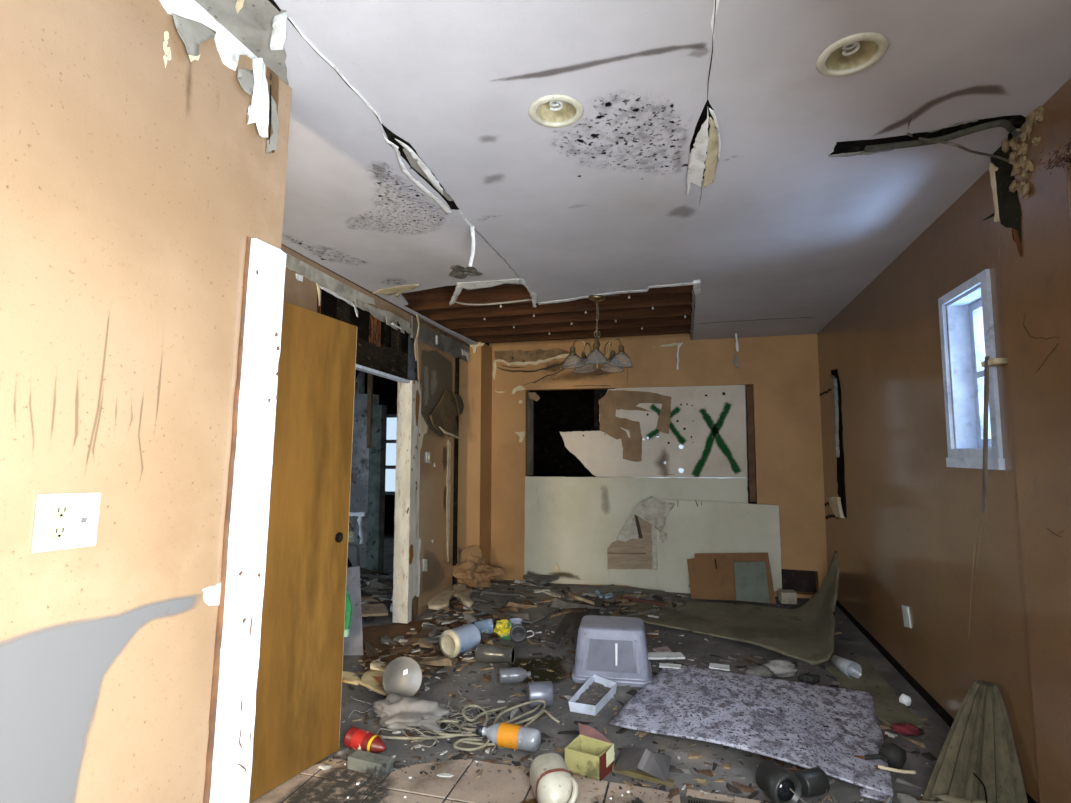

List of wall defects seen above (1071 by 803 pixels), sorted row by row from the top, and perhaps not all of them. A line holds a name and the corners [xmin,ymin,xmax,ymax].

flaking render [195,0,289,86]
crack [707,0,720,100]
water stain [353,164,444,233]
crack [287,17,519,278]
water stain [560,95,688,179]
crack [828,115,1026,257]
spalling [538,280,701,347]
flaking render [470,343,570,404]